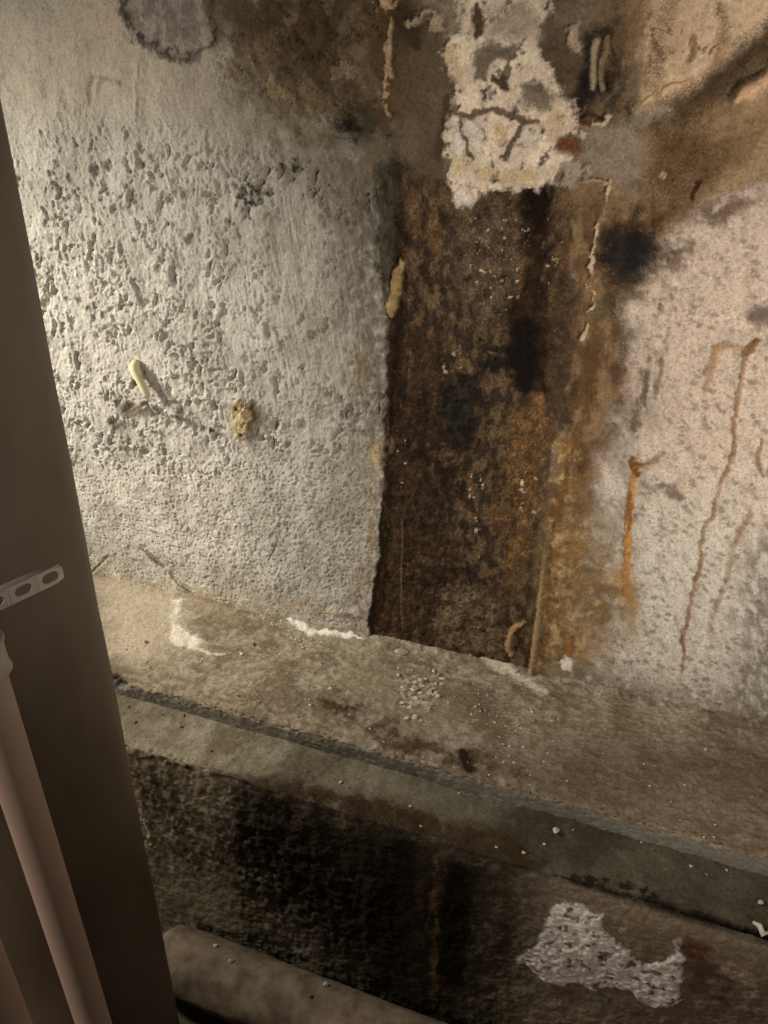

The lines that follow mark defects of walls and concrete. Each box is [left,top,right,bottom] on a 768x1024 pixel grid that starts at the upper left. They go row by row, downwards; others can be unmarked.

crack [451,106,540,161]
flaking render [368,0,593,669]
water stain [437,0,768,696]
water stain [167,594,243,656]
water stain [325,604,358,616]
rust [535,423,667,672]
rust [680,339,761,673]
water stain [221,779,512,1024]